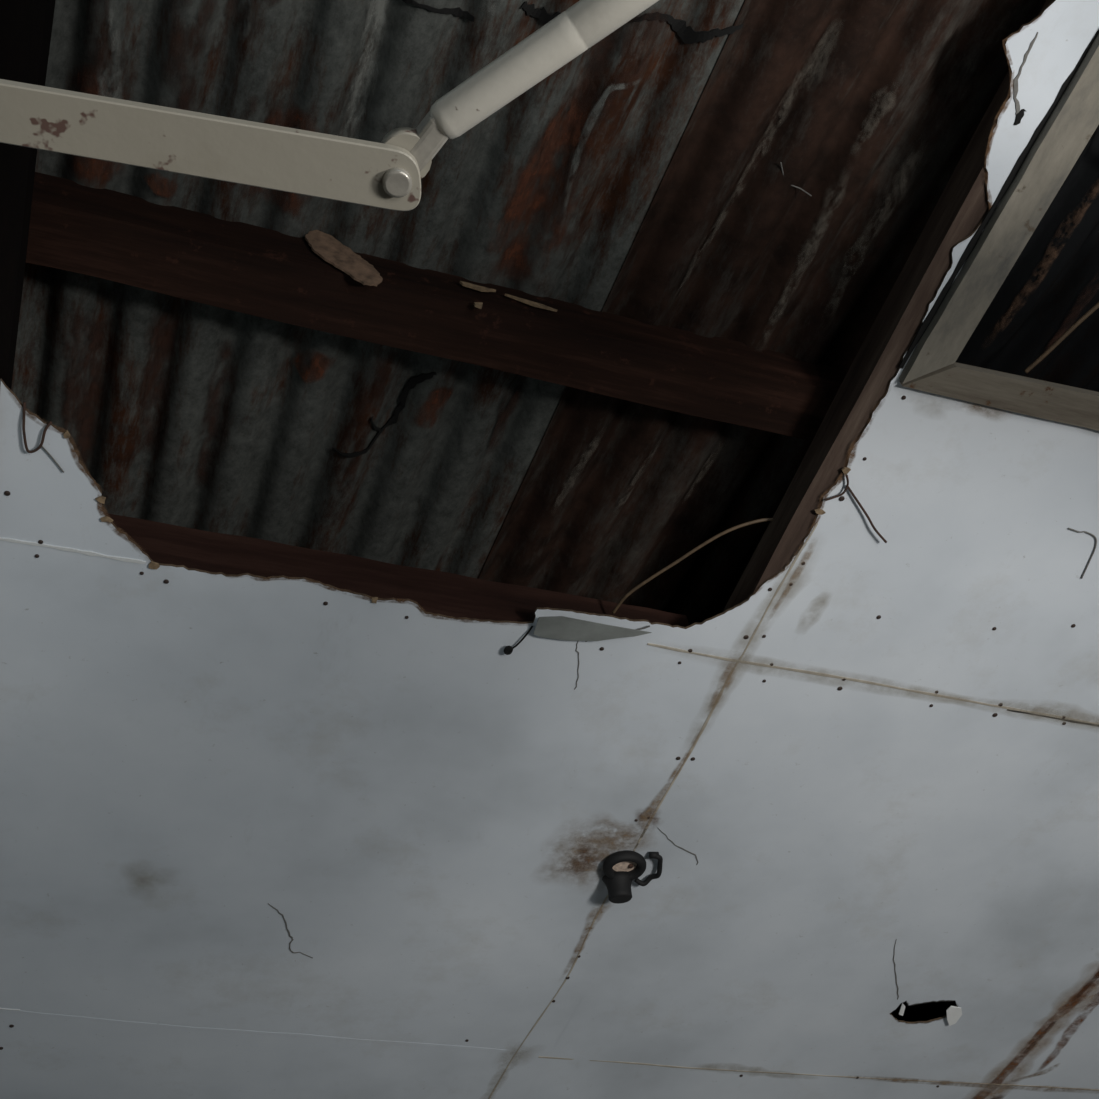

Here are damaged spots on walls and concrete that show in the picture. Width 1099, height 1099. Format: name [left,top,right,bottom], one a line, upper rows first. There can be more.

peeling [305,230,383,286]
peeling [460,281,557,312]
spalling [58,428,138,547]
spalling [811,441,857,528]
peeling [533,616,652,641]
water stain [571,832,631,871]
crack [268,903,313,958]
peeling [946,1006,962,1026]